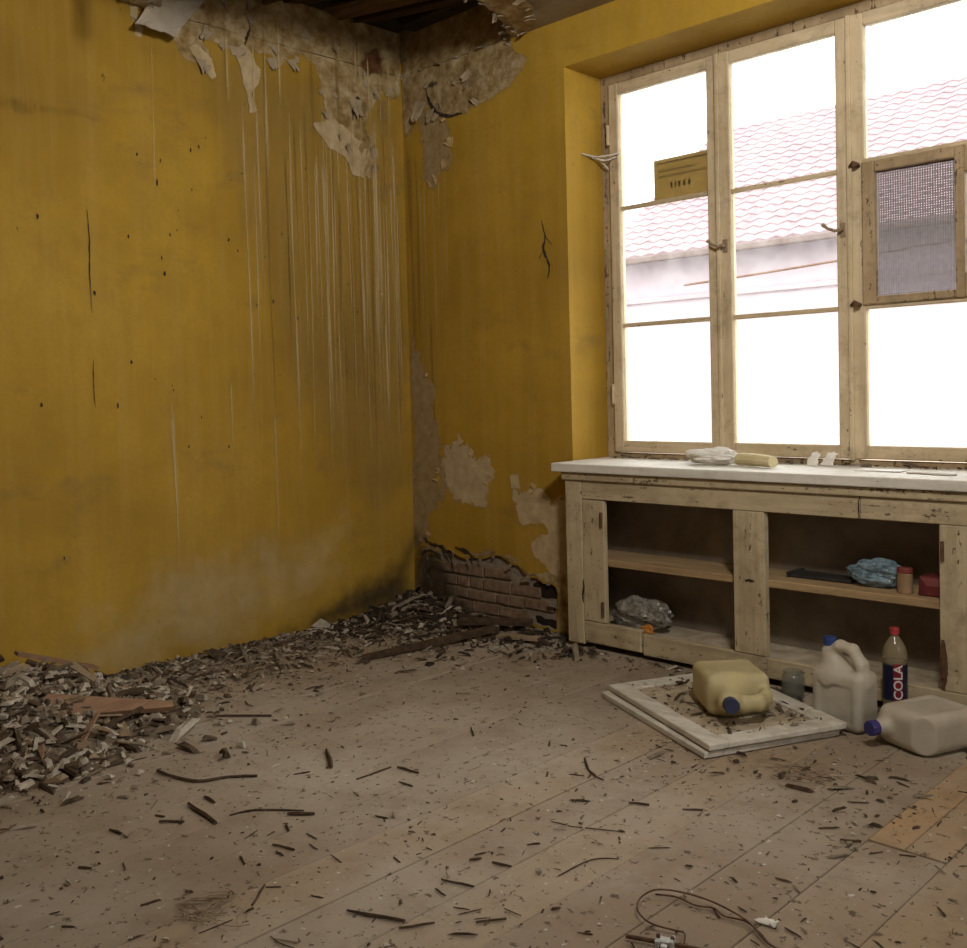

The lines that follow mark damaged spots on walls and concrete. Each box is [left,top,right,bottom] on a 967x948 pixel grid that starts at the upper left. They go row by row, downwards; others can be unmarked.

leakage [243,55,268,392]
leakage [289,116,402,406]
peeling [167,0,536,189]
crack [539,221,552,278]
spalling [409,335,569,632]